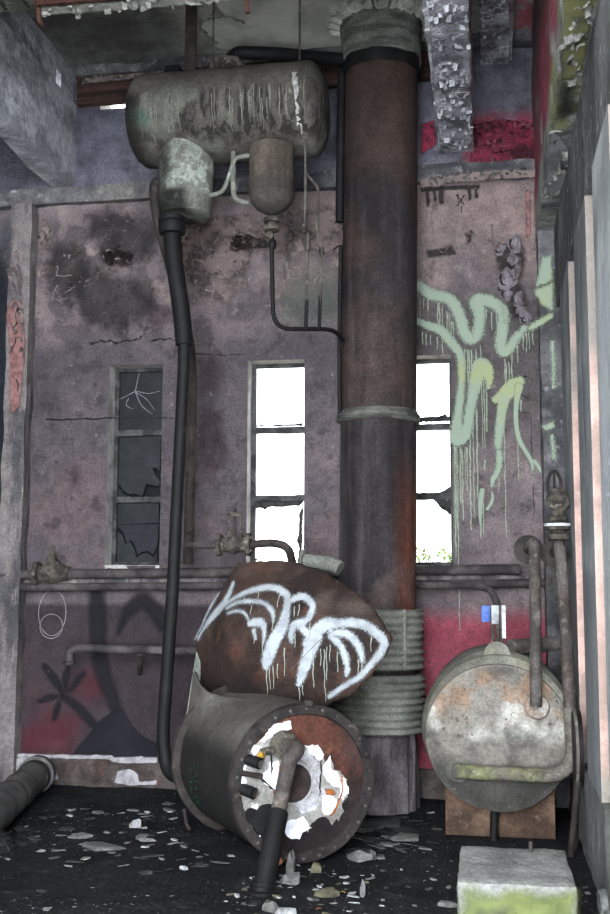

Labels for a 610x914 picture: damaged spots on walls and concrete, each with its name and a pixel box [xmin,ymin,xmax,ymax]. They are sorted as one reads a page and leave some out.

spalling [556,0,593,87]
spalling [32,0,535,206]
spalling [526,125,569,237]
peeling [6,250,25,413]
crack [89,335,175,345]